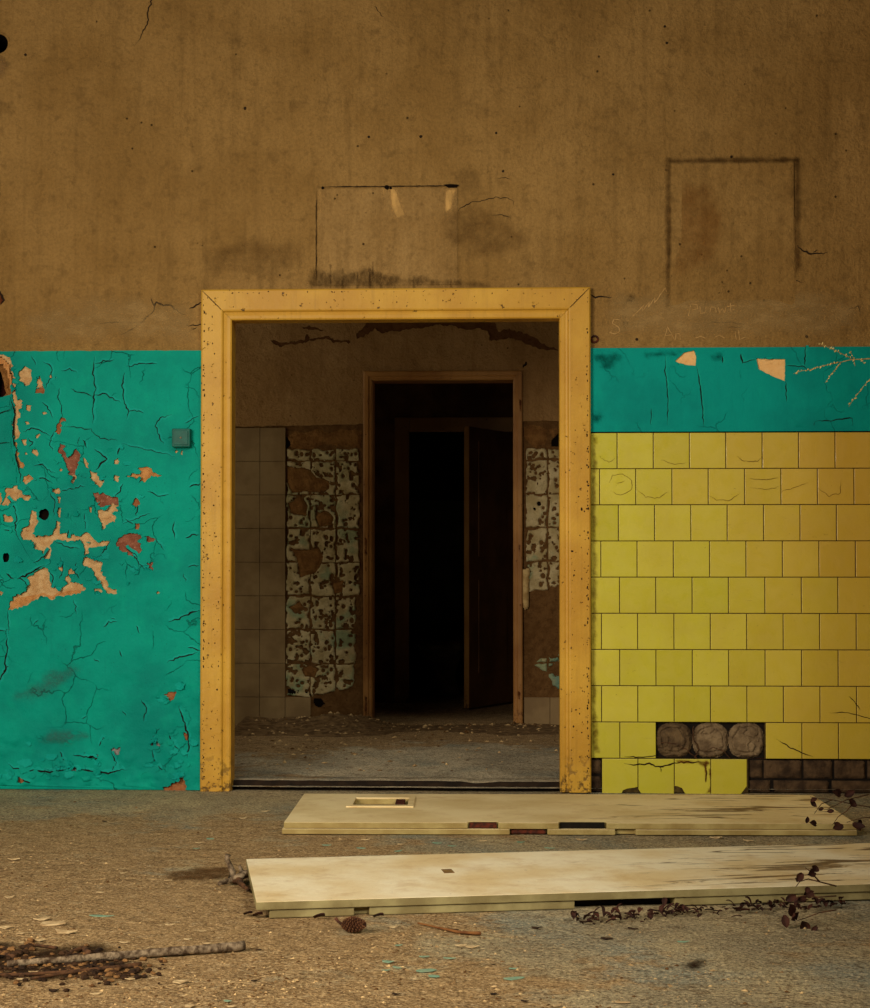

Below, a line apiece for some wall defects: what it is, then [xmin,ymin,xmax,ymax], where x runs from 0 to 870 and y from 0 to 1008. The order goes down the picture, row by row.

peeling [271,322,557,350]
peeling [676,350,696,366]
peeling [757,357,785,381]
crack [697,366,705,425]
peeling [0,355,161,610]
crack [0,355,200,615]
crack [0,610,38,683]
crack [167,645,200,662]
crack [8,734,127,783]
crack [122,700,192,770]
peeling [163,772,187,791]
crack [624,755,707,782]